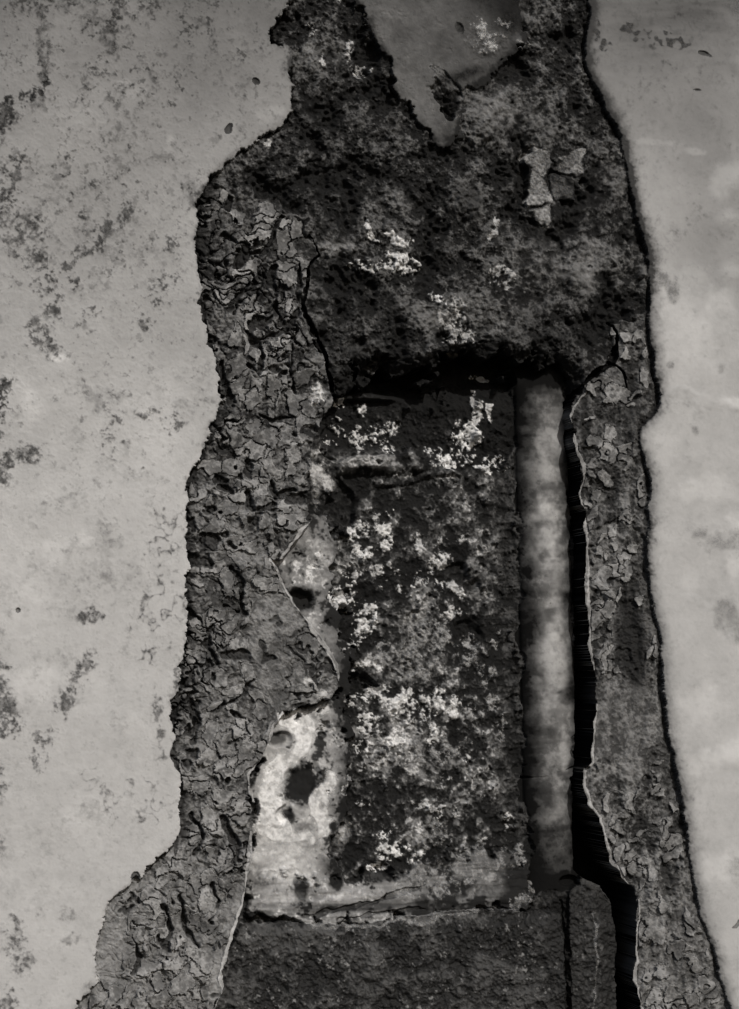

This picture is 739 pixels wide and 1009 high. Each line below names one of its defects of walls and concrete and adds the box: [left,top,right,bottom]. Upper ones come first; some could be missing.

water stain [0,65,50,134]
water stain [0,155,134,315]
crack [300,234,336,397]
water stain [312,373,397,453]
water stain [424,376,504,475]
crack [566,323,628,400]
peeling [76,188,340,1009]
water stain [327,509,399,649]
water stain [415,534,465,597]
flaking render [206,0,731,1009]
water stain [350,606,508,762]
water stain [366,799,504,899]